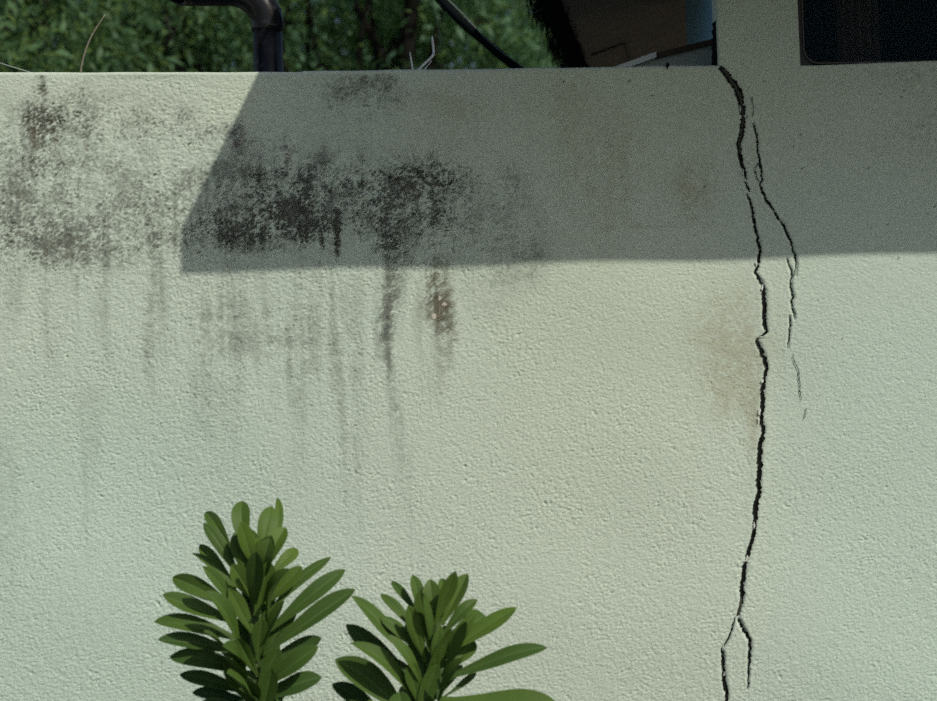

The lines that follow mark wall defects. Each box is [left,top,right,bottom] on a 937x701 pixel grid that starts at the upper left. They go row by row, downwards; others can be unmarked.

mould [23,76,68,143]
mould [1,175,118,266]
mould [118,162,359,255]
mould [370,163,454,250]
crack [711,20,806,701]